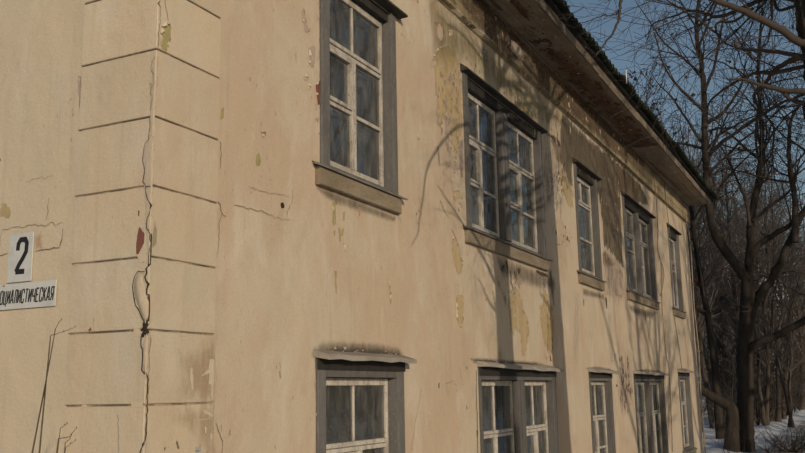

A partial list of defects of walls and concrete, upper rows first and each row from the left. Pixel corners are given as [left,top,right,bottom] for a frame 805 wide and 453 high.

peeling [158,21,171,52]
peeling [424,10,464,178]
water stain [438,19,549,118]
flaking render [449,0,648,267]
crack [132,1,168,453]
crack [217,187,290,254]
peeling [508,288,529,356]
peeling [539,288,556,361]